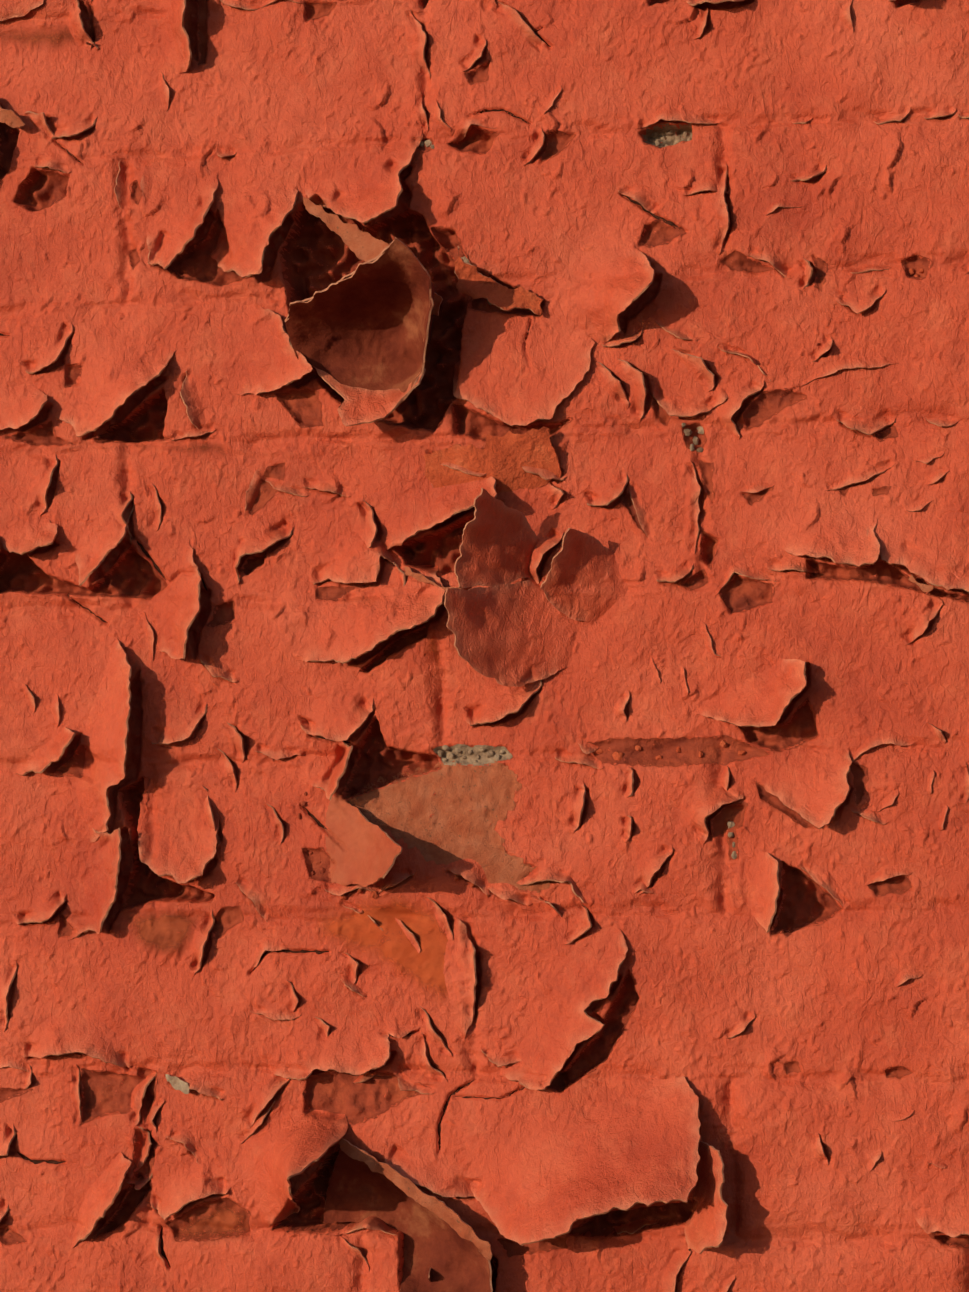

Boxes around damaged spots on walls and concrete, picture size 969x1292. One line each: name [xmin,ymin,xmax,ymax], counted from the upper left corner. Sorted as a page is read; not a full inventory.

peeling [0,106,98,212]
peeling [0,321,240,683]
peeling [114,0,969,726]
peeling [12,638,270,976]
peeling [553,657,914,935]
peeling [938,762,969,831]
peeling [0,689,728,1292]